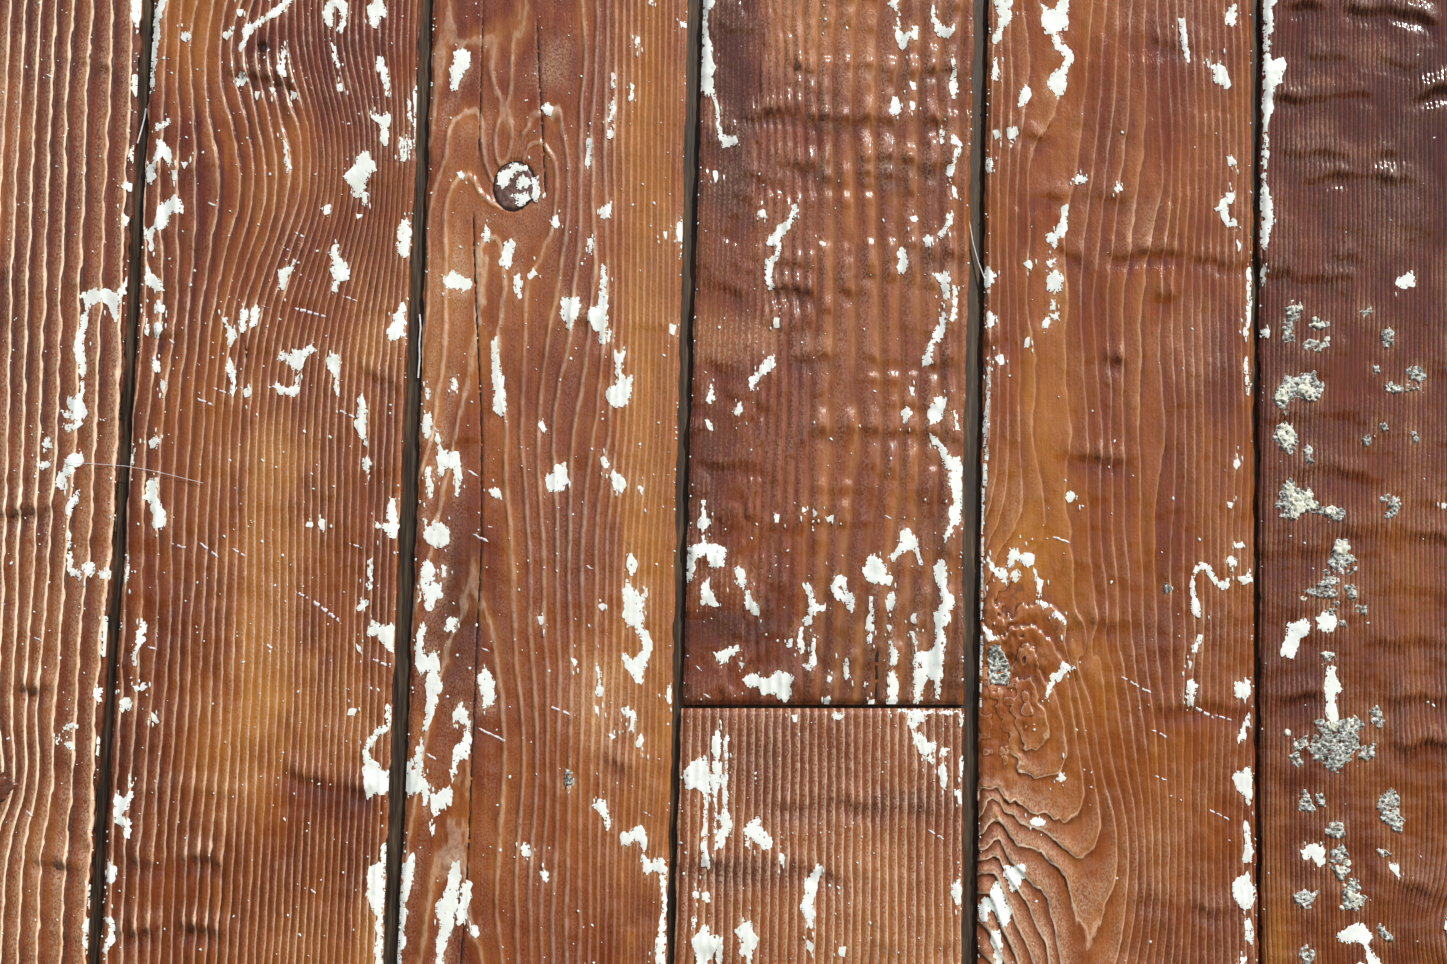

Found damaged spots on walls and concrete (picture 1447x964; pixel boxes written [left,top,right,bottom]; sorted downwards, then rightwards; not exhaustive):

peeling [343,56,417,205]
peeling [1019,0,1074,107]
peeling [1243,0,1330,352]
peeling [38,194,184,584]
peeling [406,518,497,817]
peeling [687,500,760,617]
peeling [742,396,964,804]
spalling [1274,478,1367,659]
peeling [365,843,415,964]
peeling [683,730,785,869]
peeling [1232,766,1256,964]
peeling [1298,789,1394,964]